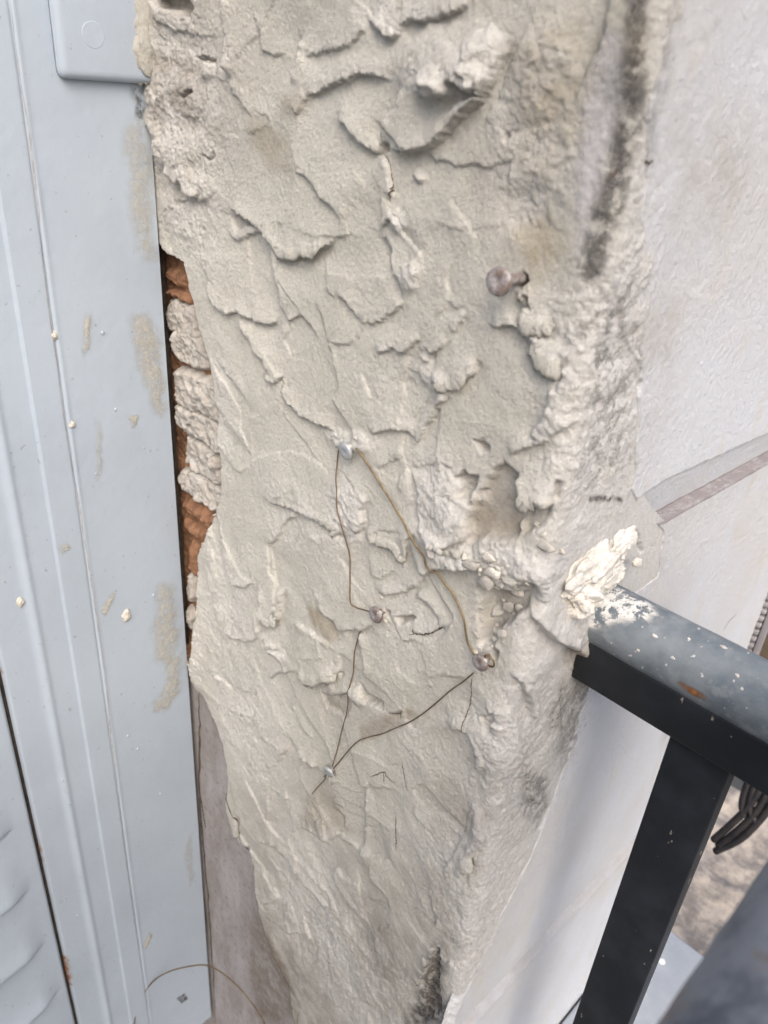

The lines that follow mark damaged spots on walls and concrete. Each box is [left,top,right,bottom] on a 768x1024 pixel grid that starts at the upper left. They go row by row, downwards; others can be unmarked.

water stain [584,0,646,278]
spalling [163,250,222,664]